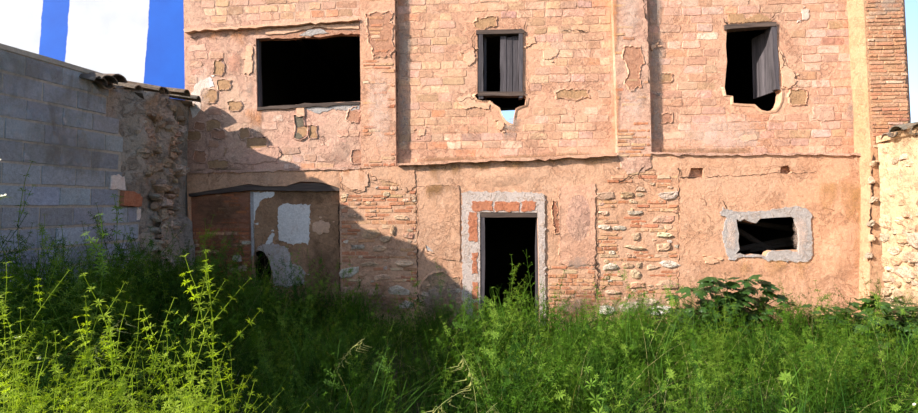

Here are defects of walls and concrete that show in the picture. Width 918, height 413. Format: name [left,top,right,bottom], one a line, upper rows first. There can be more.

crack [642,0,650,83]
peeling [457,94,529,133]
peeling [254,191,275,225]
peeling [257,203,335,287]
crack [865,154,878,270]